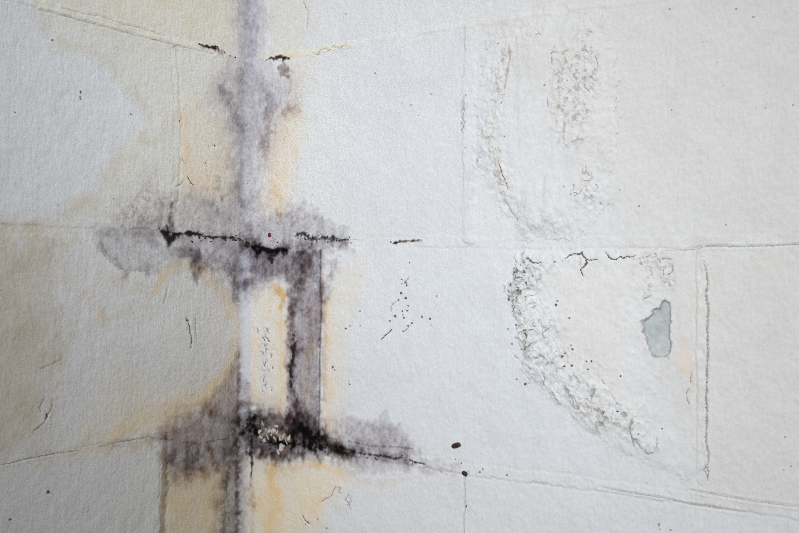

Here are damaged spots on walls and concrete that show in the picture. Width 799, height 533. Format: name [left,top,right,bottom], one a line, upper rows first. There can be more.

rust [180,99,229,198]
damp [0,0,463,533]
rust [249,279,288,414]
spalling [498,247,663,459]
crack [565,251,635,276]
spalling [644,298,673,356]